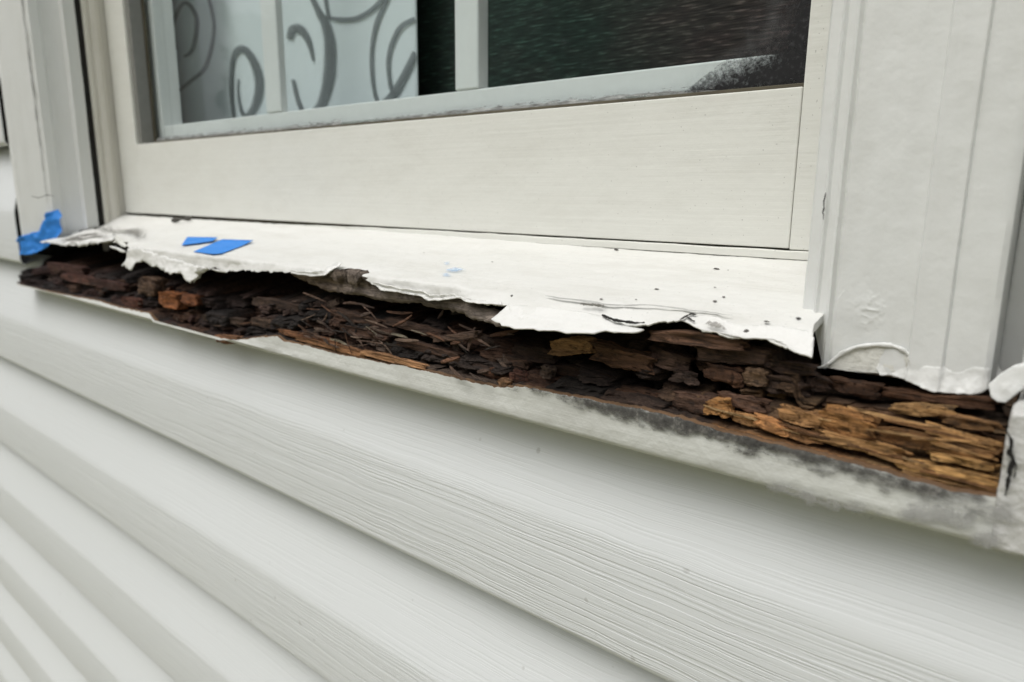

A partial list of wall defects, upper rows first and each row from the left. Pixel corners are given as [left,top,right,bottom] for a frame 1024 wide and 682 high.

peeling [64,228,227,283]
peeling [289,262,342,277]
peeling [372,281,644,334]
peeling [682,314,1024,403]
water stain [530,388,1016,549]